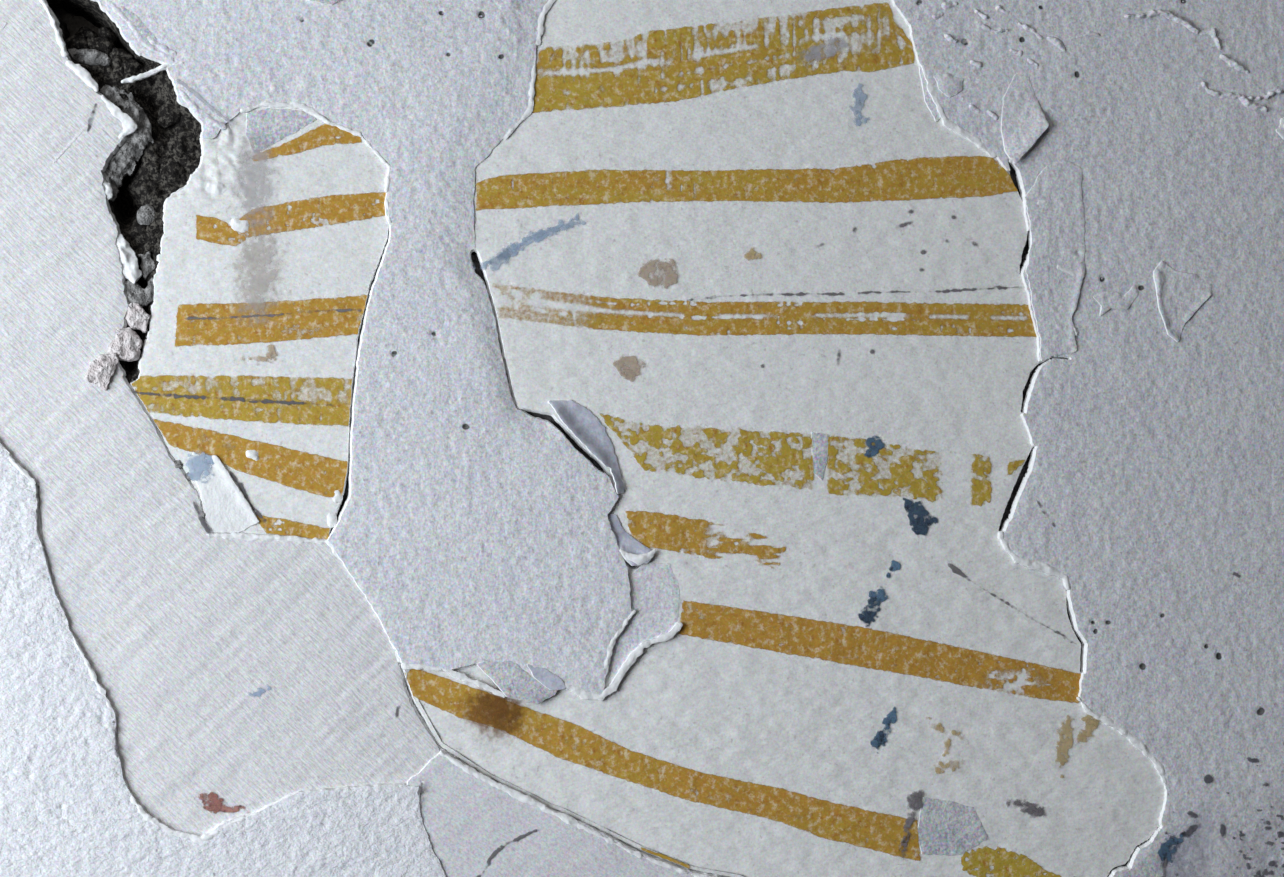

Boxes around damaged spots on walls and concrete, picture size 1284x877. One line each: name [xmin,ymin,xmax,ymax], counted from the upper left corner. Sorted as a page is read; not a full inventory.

peeling [0,0,440,842]
peeling [401,0,1167,877]